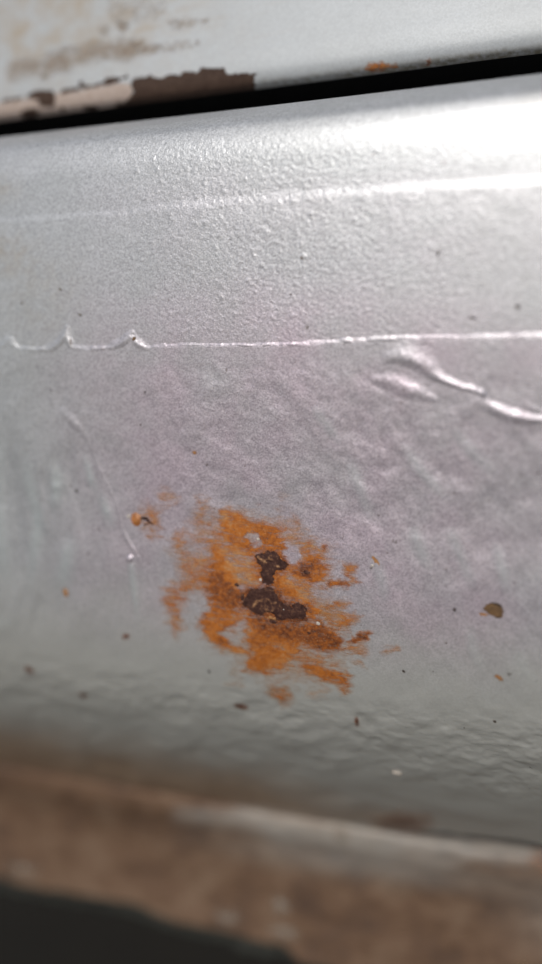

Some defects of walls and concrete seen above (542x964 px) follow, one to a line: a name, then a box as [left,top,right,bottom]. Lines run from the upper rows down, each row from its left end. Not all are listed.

peeling [0,67,257,121]
rust [164,506,371,693]